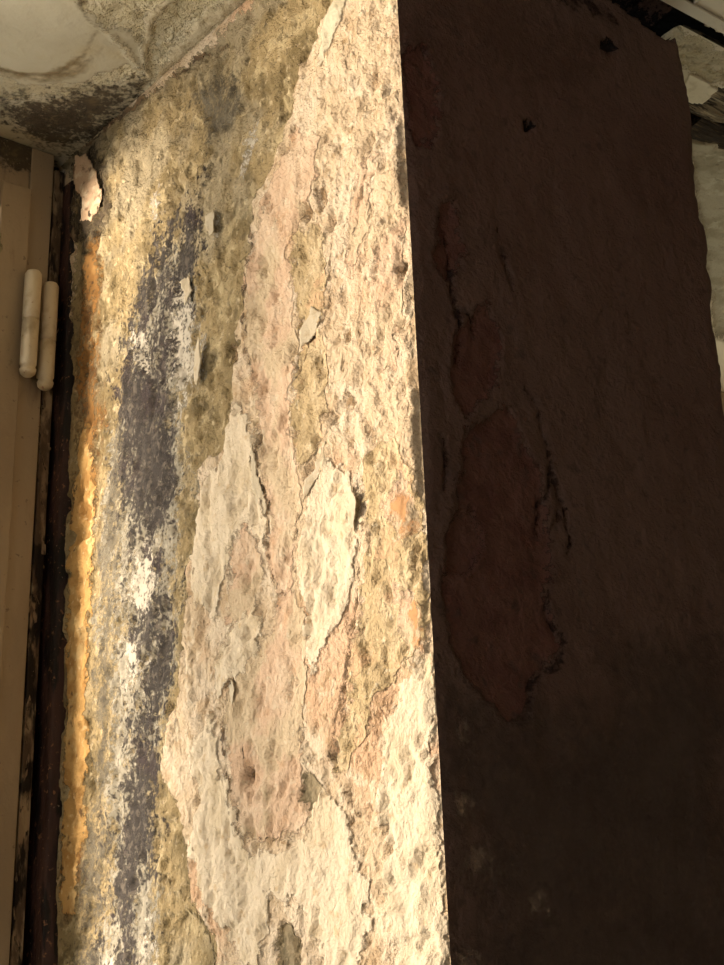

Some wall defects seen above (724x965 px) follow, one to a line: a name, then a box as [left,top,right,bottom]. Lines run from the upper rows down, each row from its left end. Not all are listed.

leakage [0,61,146,254]
corrosion [70,231,109,518]
leakage [74,165,220,965]
peeling [0,0,449,965]
leakage [239,116,262,179]
crack [220,722,283,842]
crack [254,435,296,596]
crack [295,149,387,379]
crack [327,522,372,818]
peeling [441,299,561,723]
peeling [663,26,724,85]
spalling [692,139,724,341]